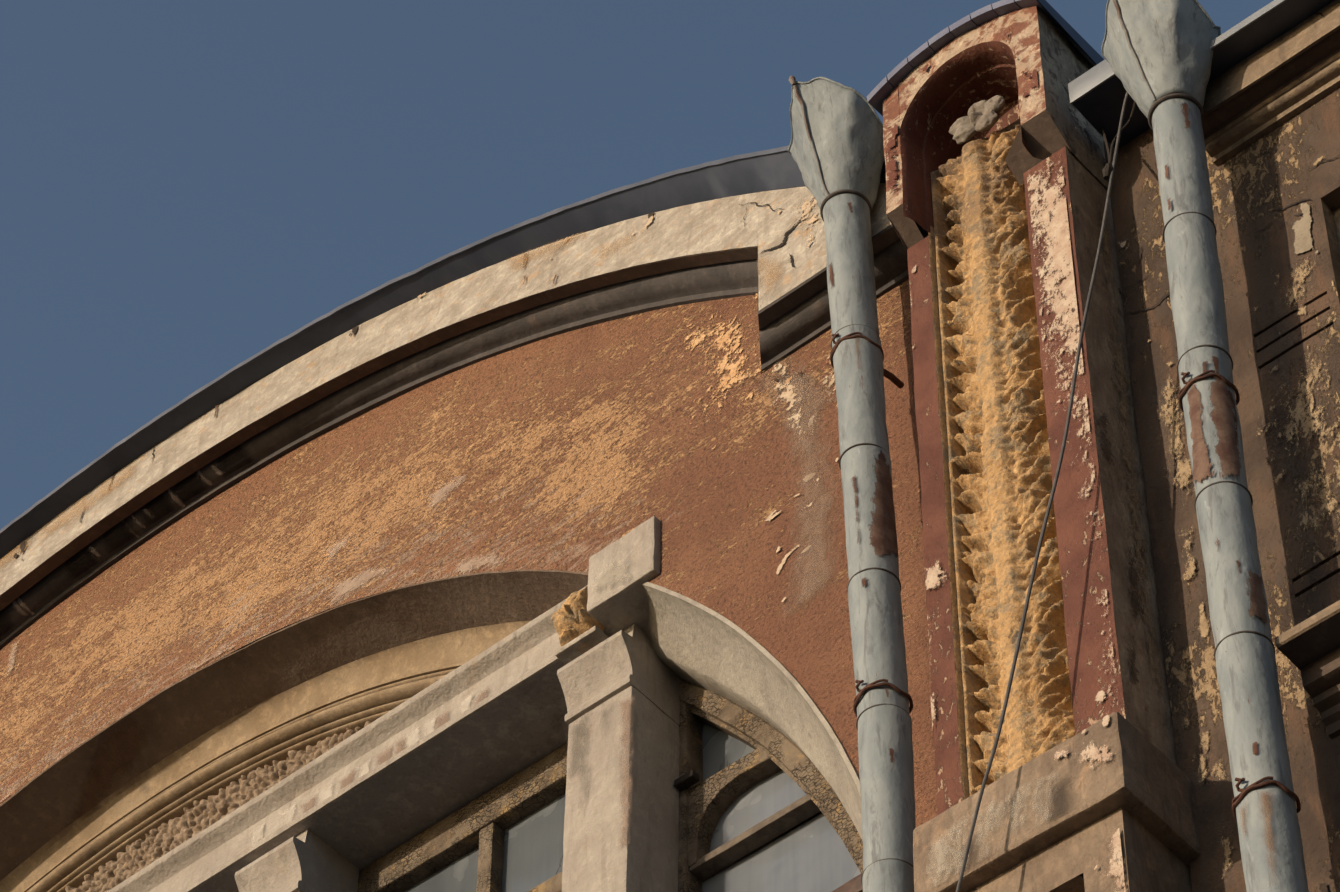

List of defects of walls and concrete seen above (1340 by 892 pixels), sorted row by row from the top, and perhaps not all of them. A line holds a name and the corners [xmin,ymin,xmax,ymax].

crack [739,197,815,267]
spalling [1275,203,1318,315]
peeling [667,306,817,435]
peeling [1027,157,1113,497]
peeling [1159,361,1195,494]
peeling [1257,346,1338,484]
peeling [1182,527,1196,580]
peeling [1291,465,1340,538]
peeling [1095,589,1139,726]
peeling [1198,602,1210,637]
peeling [1192,731,1225,782]
peeling [1094,828,1126,892]